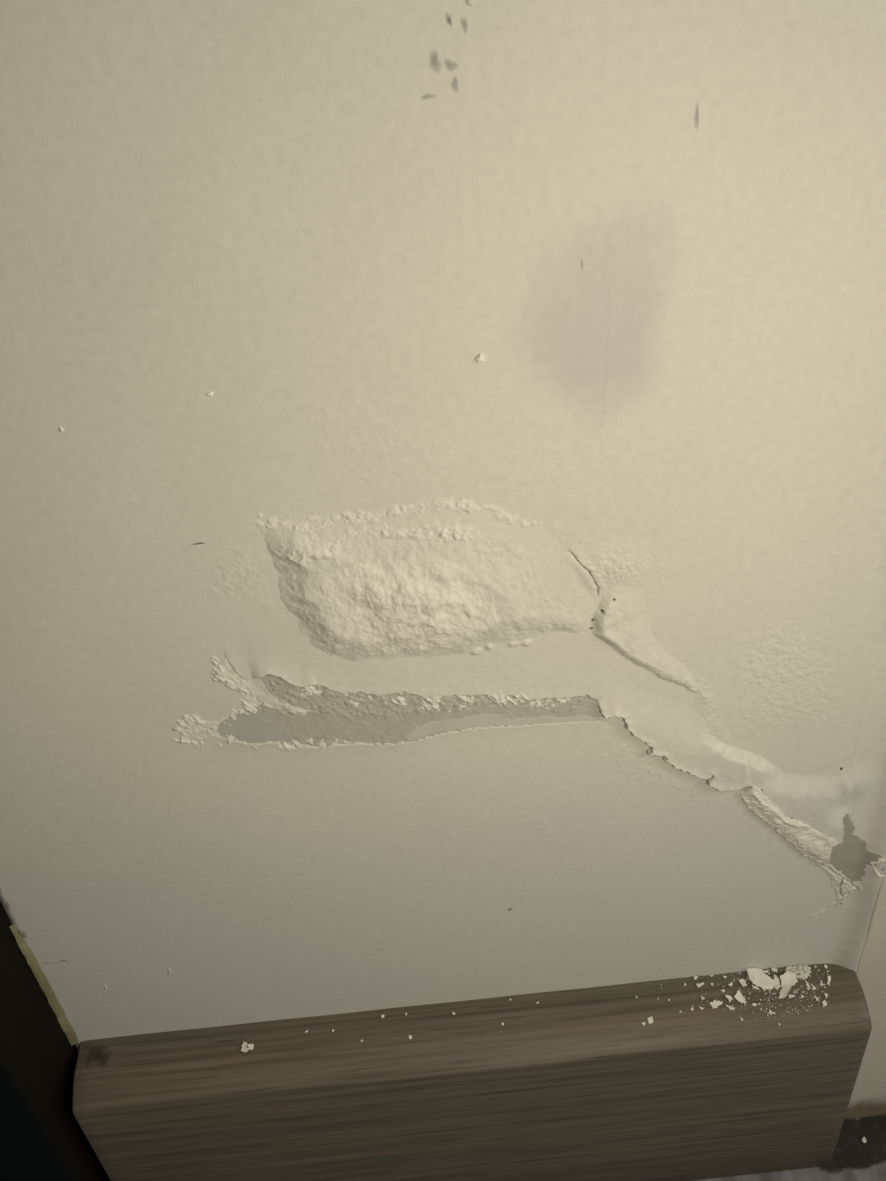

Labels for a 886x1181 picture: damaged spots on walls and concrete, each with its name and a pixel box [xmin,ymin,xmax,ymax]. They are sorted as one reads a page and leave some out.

peeling [172,622,886,892]